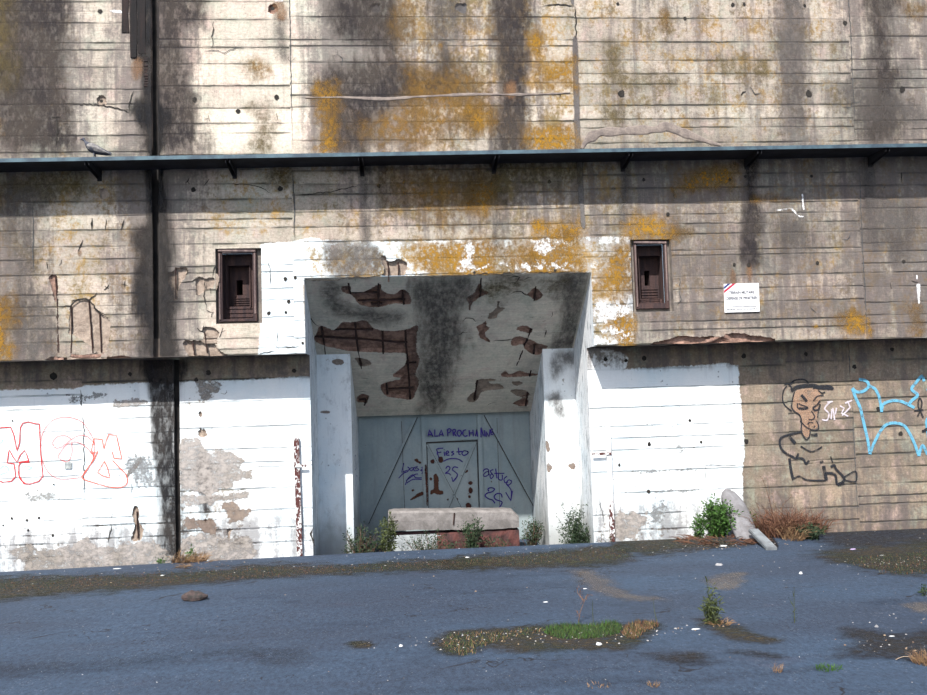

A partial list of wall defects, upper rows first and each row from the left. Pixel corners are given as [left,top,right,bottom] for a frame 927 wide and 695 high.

damp [0,0,72,152]
damp [318,0,462,152]
damp [493,0,532,150]
damp [842,0,916,141]
damp [740,159,762,265]
spalling [45,274,133,360]
damp [131,169,186,563]
spalling [183,326,230,357]
spalling [314,320,420,400]
spalling [467,325,548,406]
spalling [652,333,775,345]
peeling [10,428,259,571]